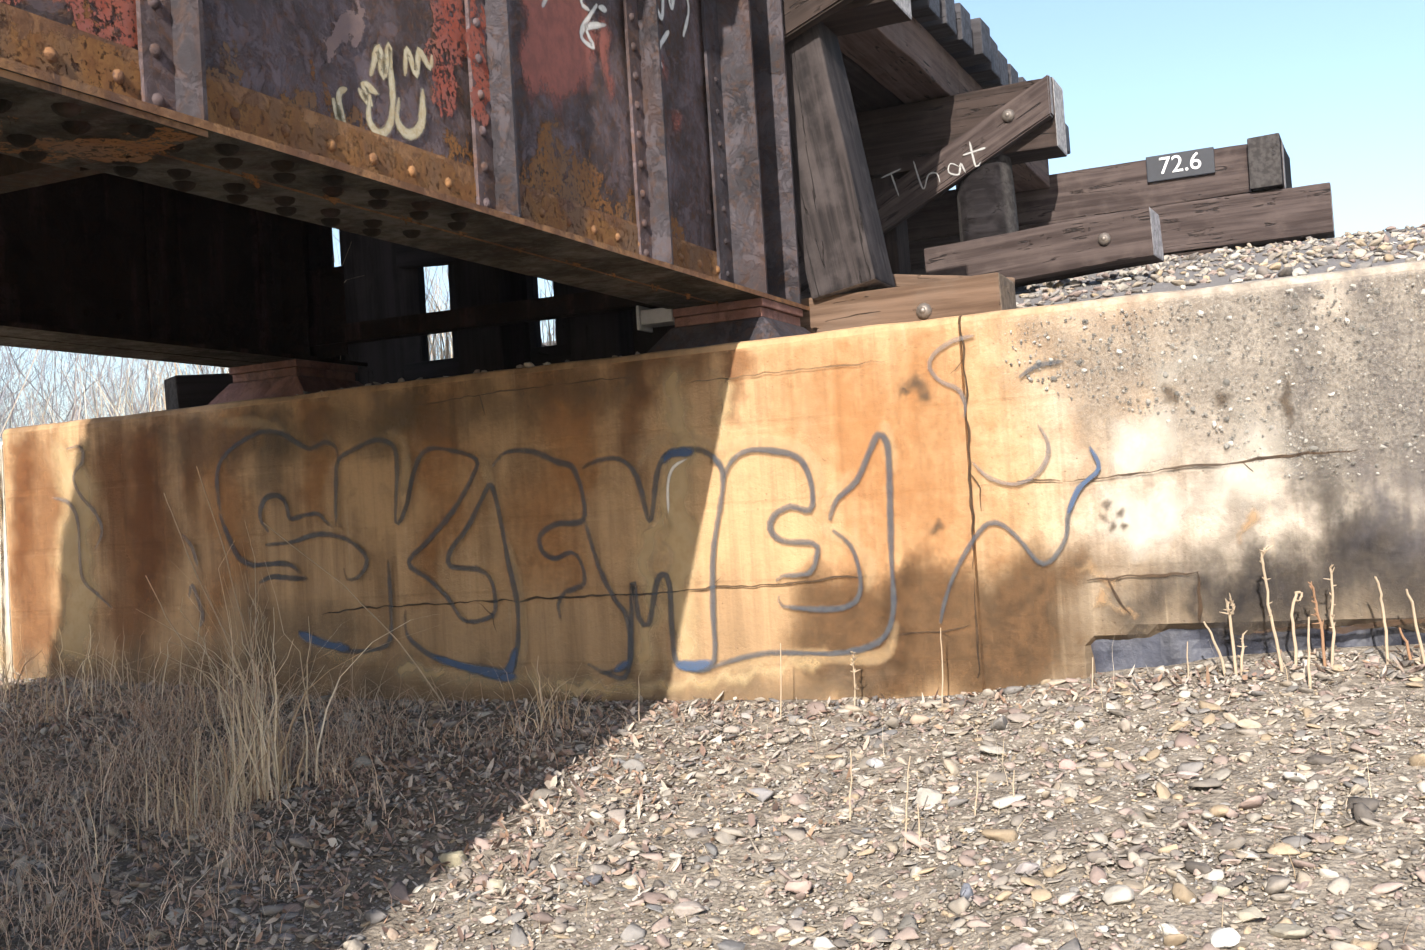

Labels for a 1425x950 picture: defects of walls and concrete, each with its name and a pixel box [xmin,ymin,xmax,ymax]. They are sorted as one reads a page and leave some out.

peeling [0,0,142,101]
peeling [206,0,490,204]
rust [0,127,198,164]
peeling [671,216,719,279]
rust [727,349,747,401]
rust [9,445,65,657]
crack [885,323,981,678]
damp [1112,489,1183,547]
crack [1017,449,1359,482]
damp [1226,411,1284,492]
damp [1189,440,1425,627]
crack [322,575,866,632]